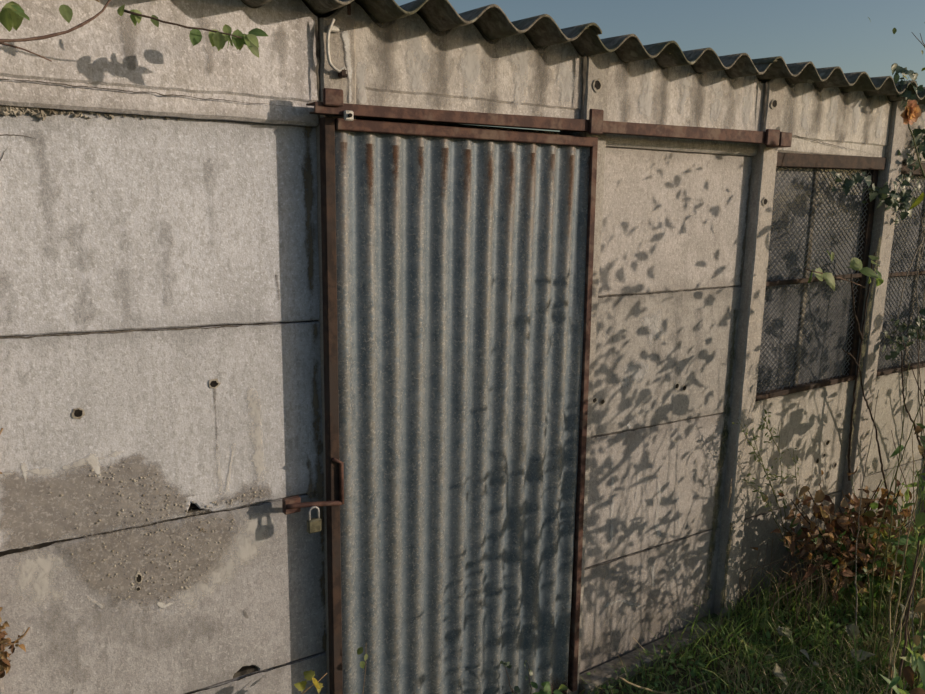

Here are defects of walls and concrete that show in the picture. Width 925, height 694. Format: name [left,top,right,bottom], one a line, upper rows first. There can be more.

rust [302,126,314,290]
rust [306,363,324,551]
water stain [17,555,63,600]
peeling [0,450,270,608]
crack [0,501,276,557]
water stain [174,515,274,606]
crack [188,655,318,694]